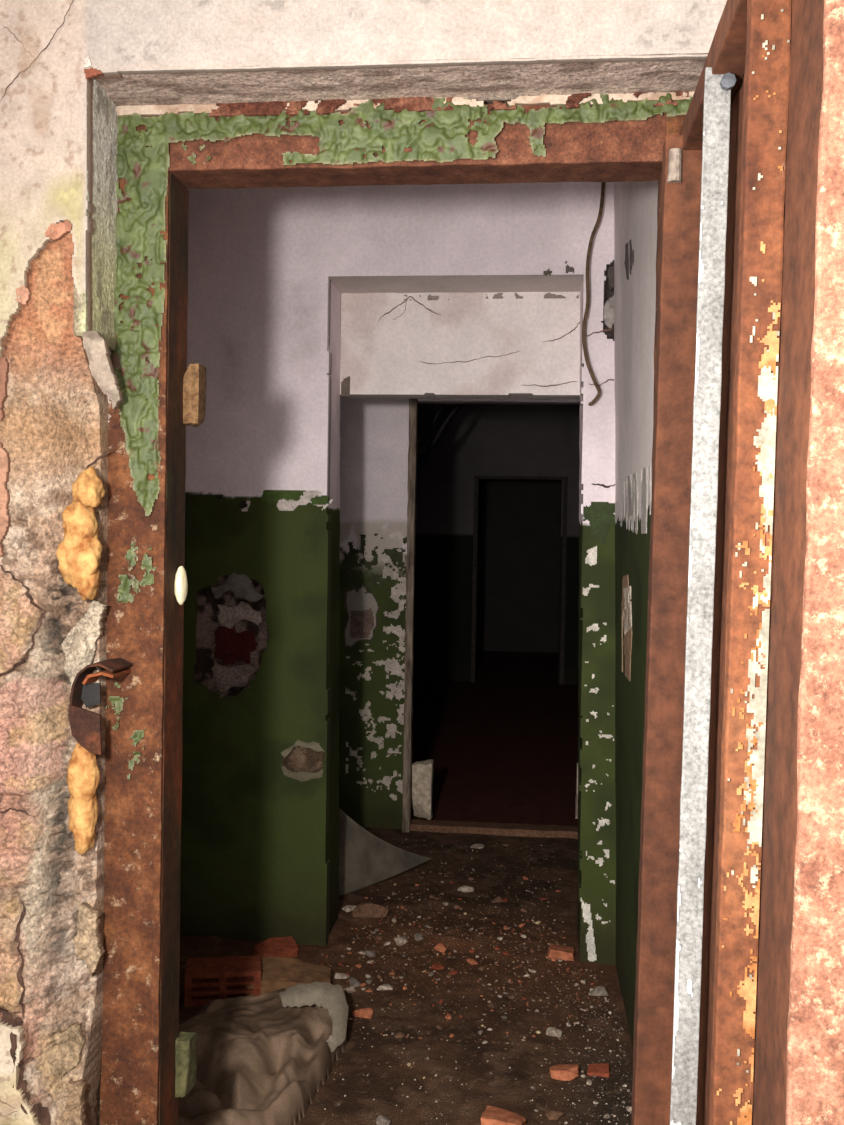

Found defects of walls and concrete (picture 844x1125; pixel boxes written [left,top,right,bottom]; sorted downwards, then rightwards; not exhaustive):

crack [0,0,74,101]
crack [379,296,440,320]
crack [525,379,615,387]
corrosion [757,300,780,380]
corrosion [764,399,777,417]
crack [0,565,46,677]
spalling [0,91,695,1125]
corrosion [735,497,773,666]
crack [0,808,35,817]
corrosion [717,689,763,1125]
crack [0,902,51,1125]
corrosion [672,939,693,1079]